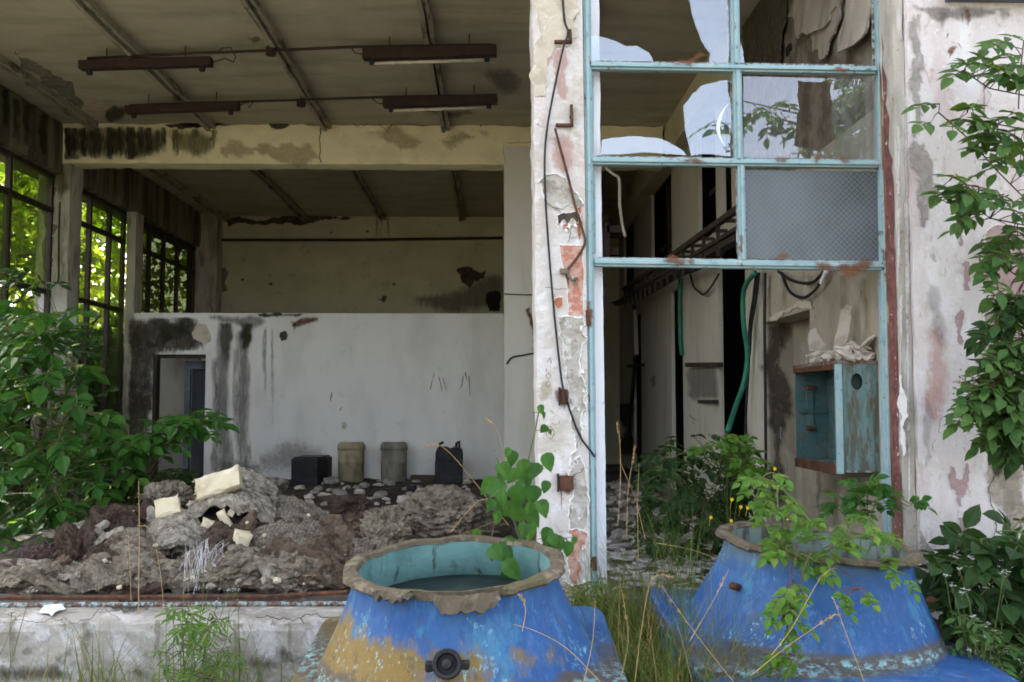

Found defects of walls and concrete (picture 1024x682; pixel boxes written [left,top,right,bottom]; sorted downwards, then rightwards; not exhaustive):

spalling [13,48,109,121]
water stain [64,106,215,159]
peeling [529,0,580,99]
spalling [223,216,356,228]
water stain [128,317,203,441]
peeling [192,323,212,344]
water stain [213,313,301,469]
flaking render [455,265,487,288]
hole [485,290,501,311]
flaking render [538,137,591,606]
water stain [761,323,791,505]
corrosion [817,64,893,496]